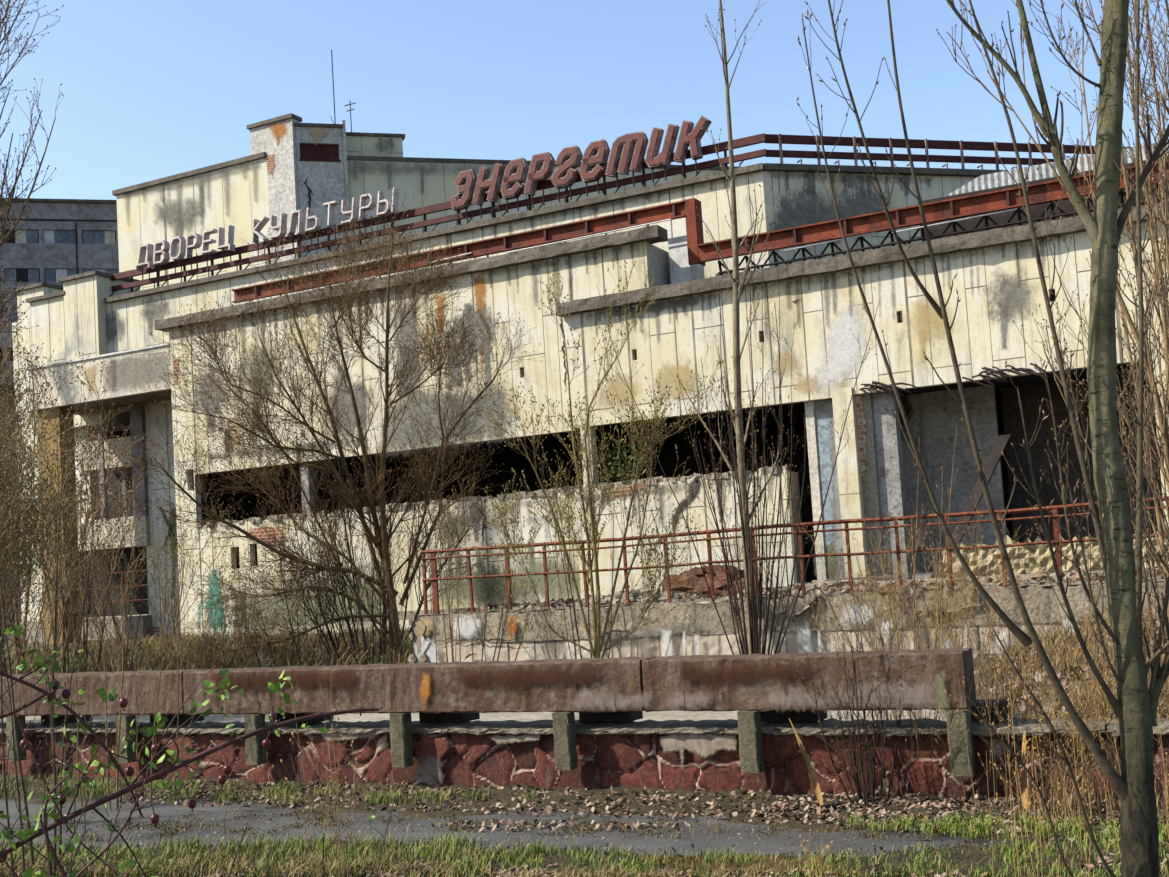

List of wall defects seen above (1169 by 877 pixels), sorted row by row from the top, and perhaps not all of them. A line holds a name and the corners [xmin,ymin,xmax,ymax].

leakage [155,184,202,253]
crack [304,177,314,208]
leakage [770,172,889,231]
corrosion [473,275,485,314]
leakage [986,275,1030,348]
leakage [323,304,512,452]
corrosion [420,675,430,709]
spalling [660,733,736,765]